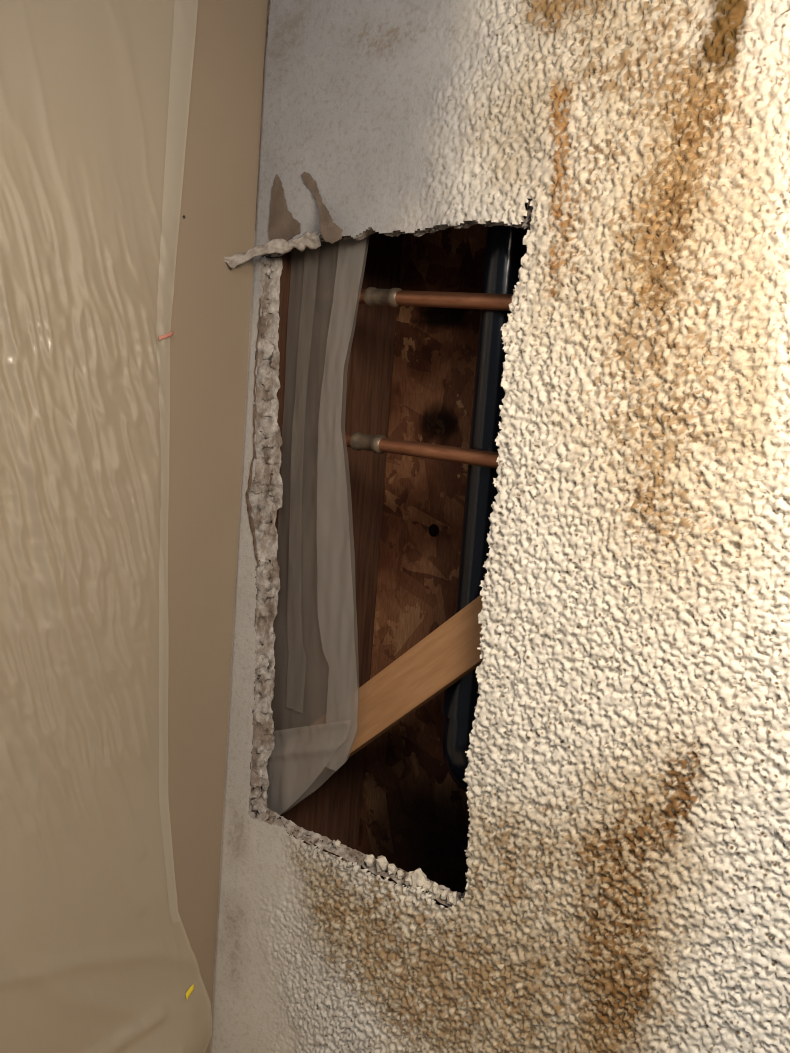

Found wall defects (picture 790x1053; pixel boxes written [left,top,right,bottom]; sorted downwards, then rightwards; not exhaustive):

spalling [340,199,534,241]
leakage [526,0,764,563]
spalling [248,248,465,907]
leakage [299,746,701,1053]